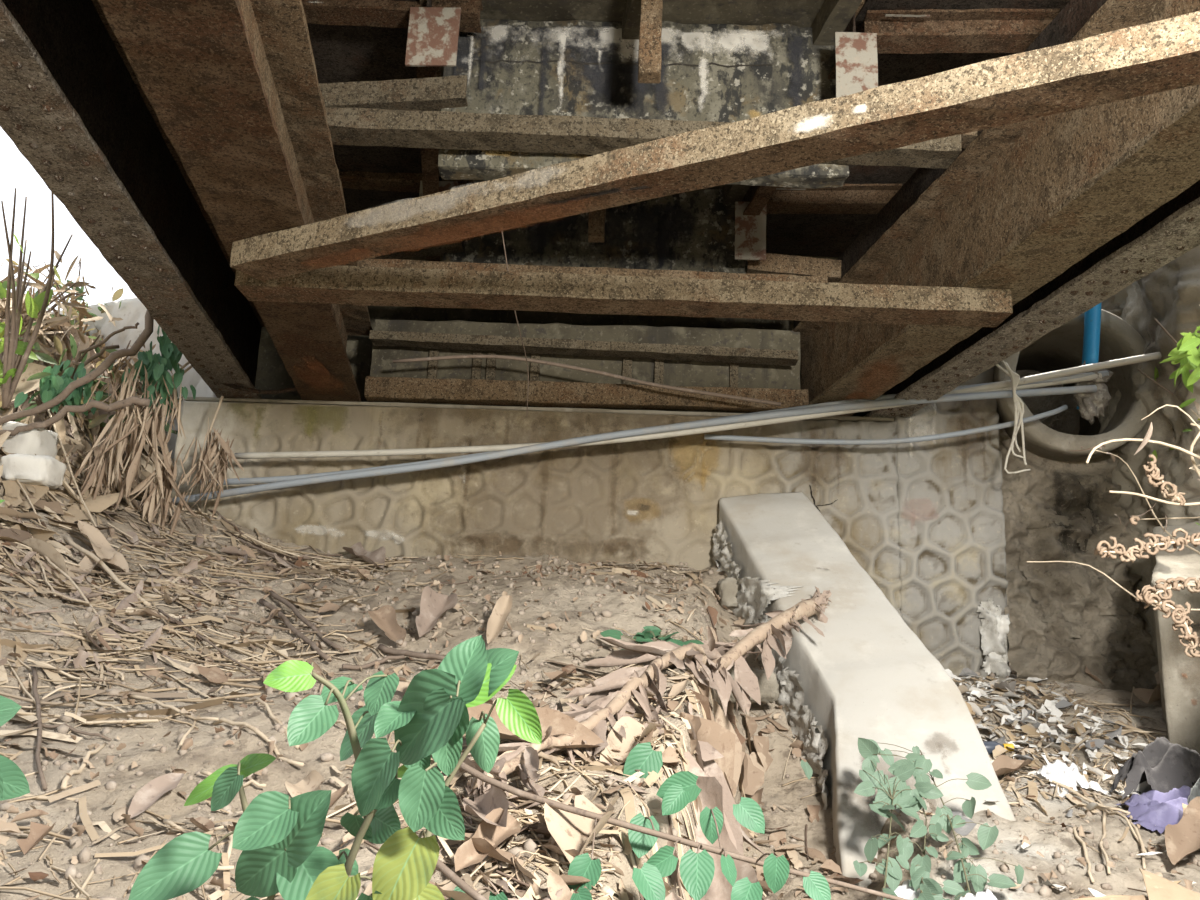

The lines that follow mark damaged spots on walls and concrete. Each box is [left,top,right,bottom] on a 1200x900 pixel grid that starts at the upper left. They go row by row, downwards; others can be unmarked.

damp [453,26,671,120]
damp [787,35,806,107]
damp [525,186,695,268]
flaking render [712,521,805,630]
flaking render [754,642,828,811]